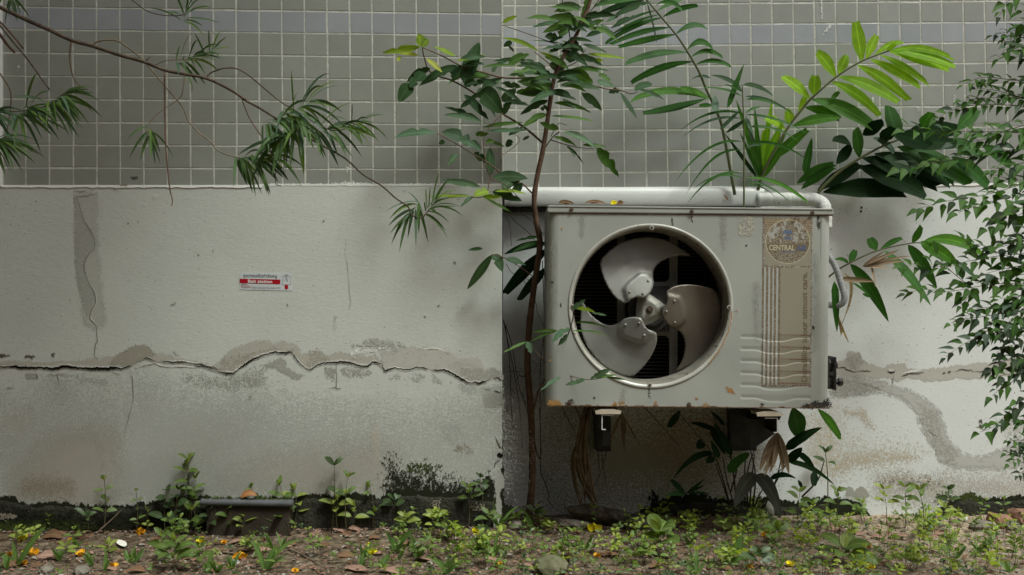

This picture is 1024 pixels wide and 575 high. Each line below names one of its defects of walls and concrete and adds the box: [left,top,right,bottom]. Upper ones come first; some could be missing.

spalling [0,338,503,386]
crack [1,189,525,436]
water stain [0,345,546,533]
crack [840,367,924,390]